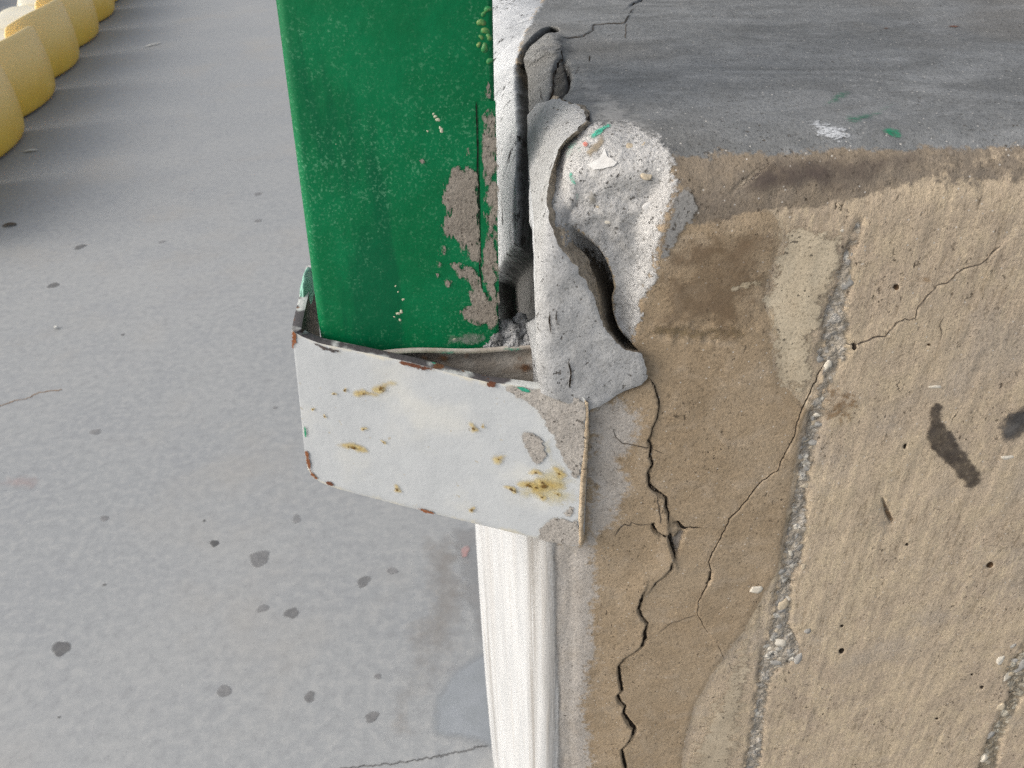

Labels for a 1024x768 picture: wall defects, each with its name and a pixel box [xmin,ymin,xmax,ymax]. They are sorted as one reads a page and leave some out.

peeling [436,82,500,329]
crack [845,246,1000,345]
corrosion [332,384,385,396]
corrosion [505,468,565,500]
leakage [928,403,980,488]
leakage [1000,410,1024,440]
crack [614,360,826,768]